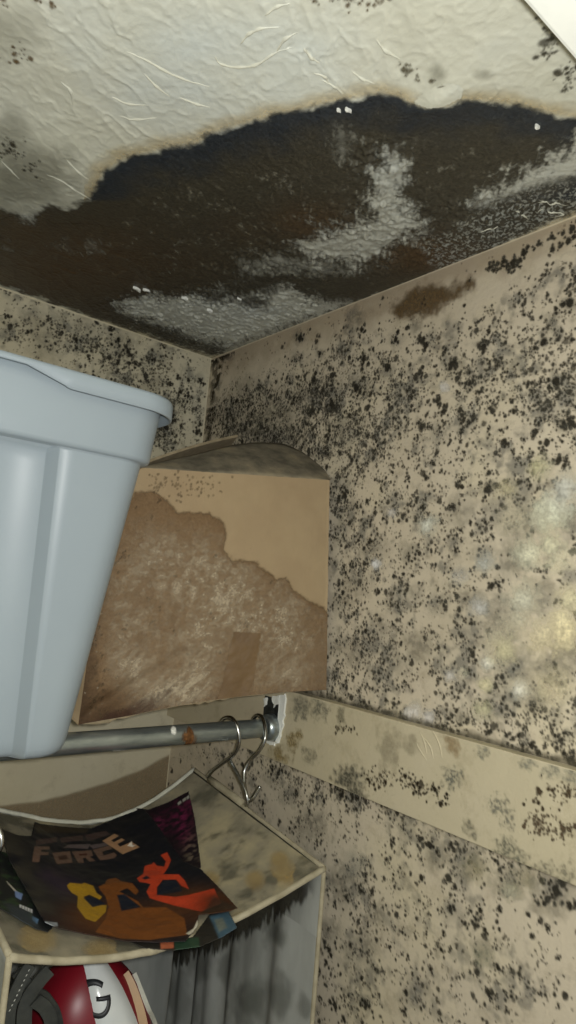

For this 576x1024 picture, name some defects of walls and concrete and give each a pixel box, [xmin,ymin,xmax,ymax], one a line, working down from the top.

water stain [0,94,576,767]
peeling [263,694,287,746]
water stain [0,743,576,1024]